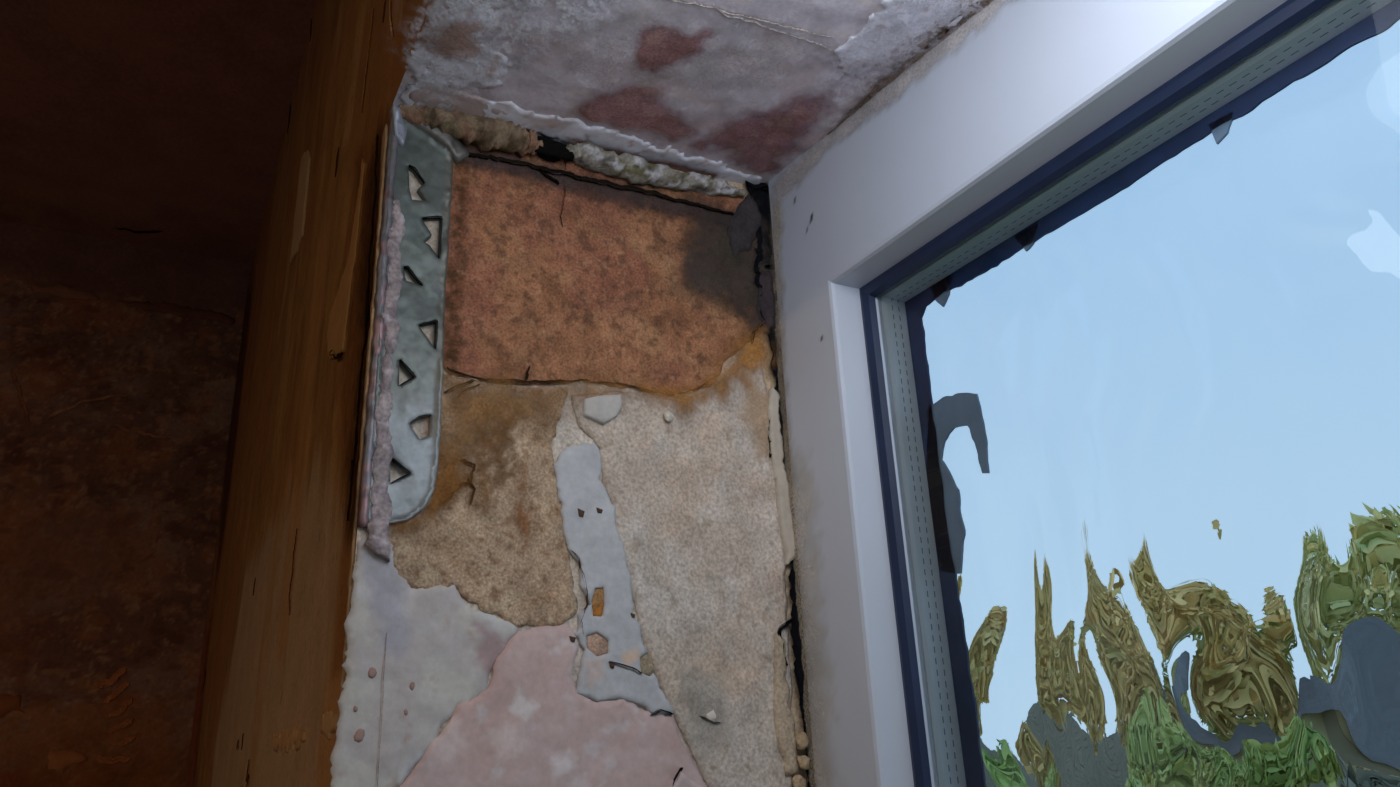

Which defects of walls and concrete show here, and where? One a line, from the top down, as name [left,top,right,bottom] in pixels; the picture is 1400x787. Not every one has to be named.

peeling [434,23,479,55]
peeling [579,27,831,173]
peeling [290,150,311,265]
peeling [327,158,367,360]
flaking render [399,104,762,425]
damp [455,142,777,332]
peeling [766,387,797,565]
peeling [354,729,365,742]
peeling [772,630,799,776]